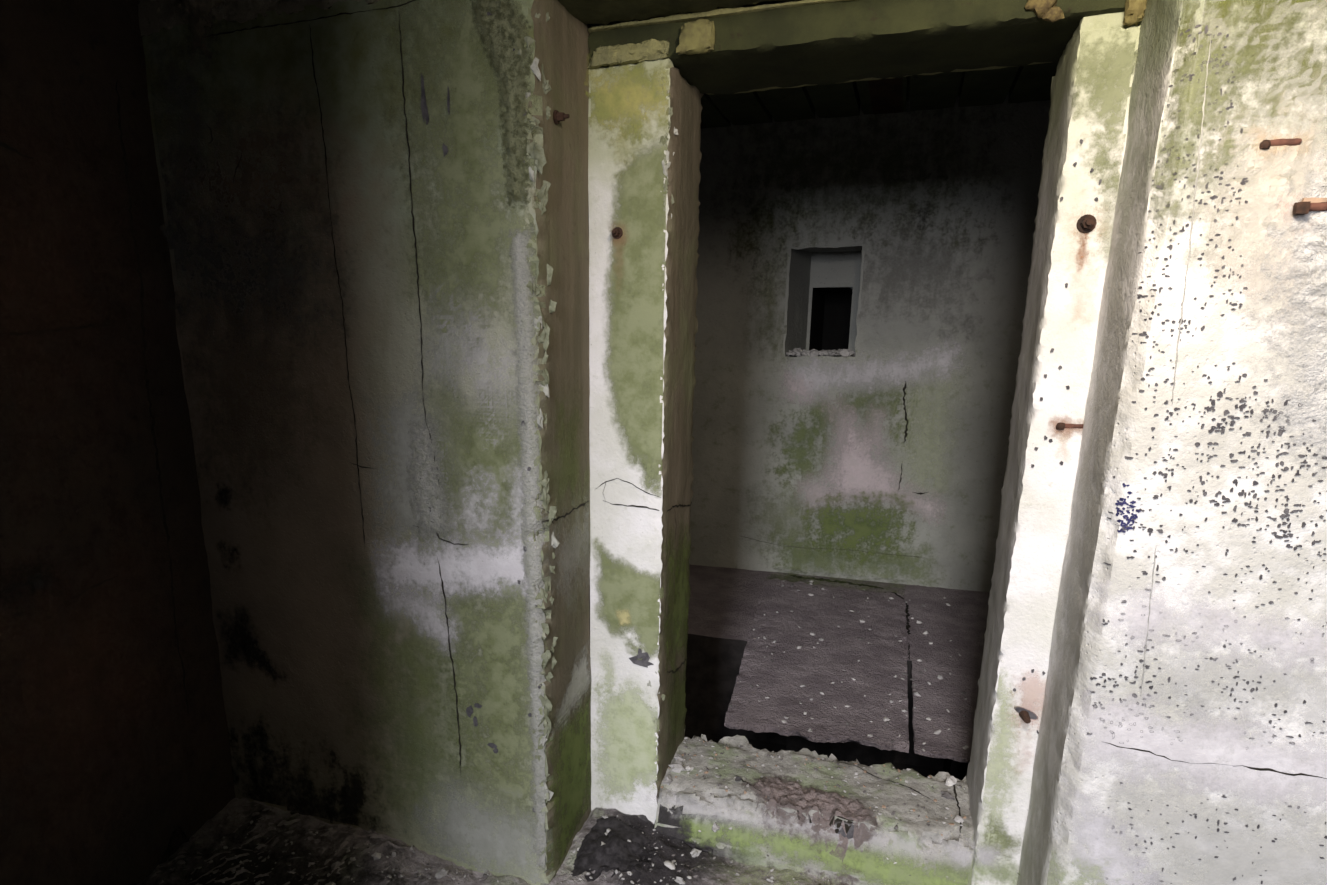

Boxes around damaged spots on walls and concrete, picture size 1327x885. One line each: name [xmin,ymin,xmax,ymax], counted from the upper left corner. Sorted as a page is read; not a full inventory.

damp [373,290,537,645]
damp [550,647,612,735]
crack [1104,742,1327,779]